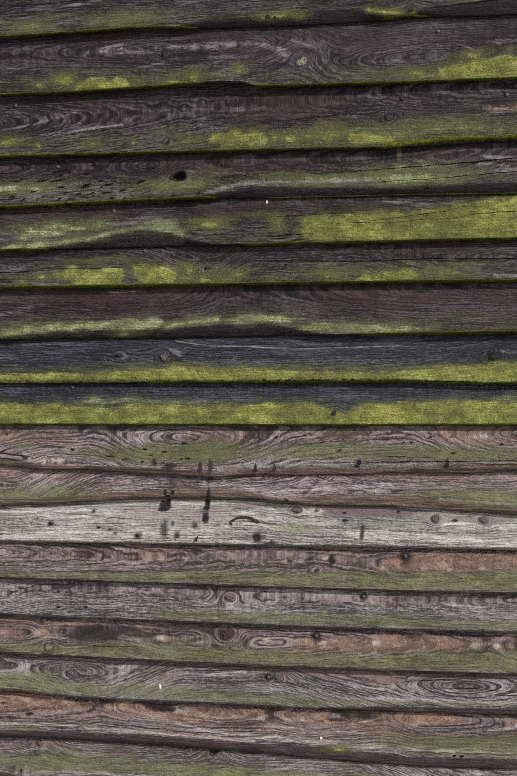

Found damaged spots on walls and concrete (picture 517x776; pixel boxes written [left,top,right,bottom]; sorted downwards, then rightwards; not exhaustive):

leakage [202,499,210,523]